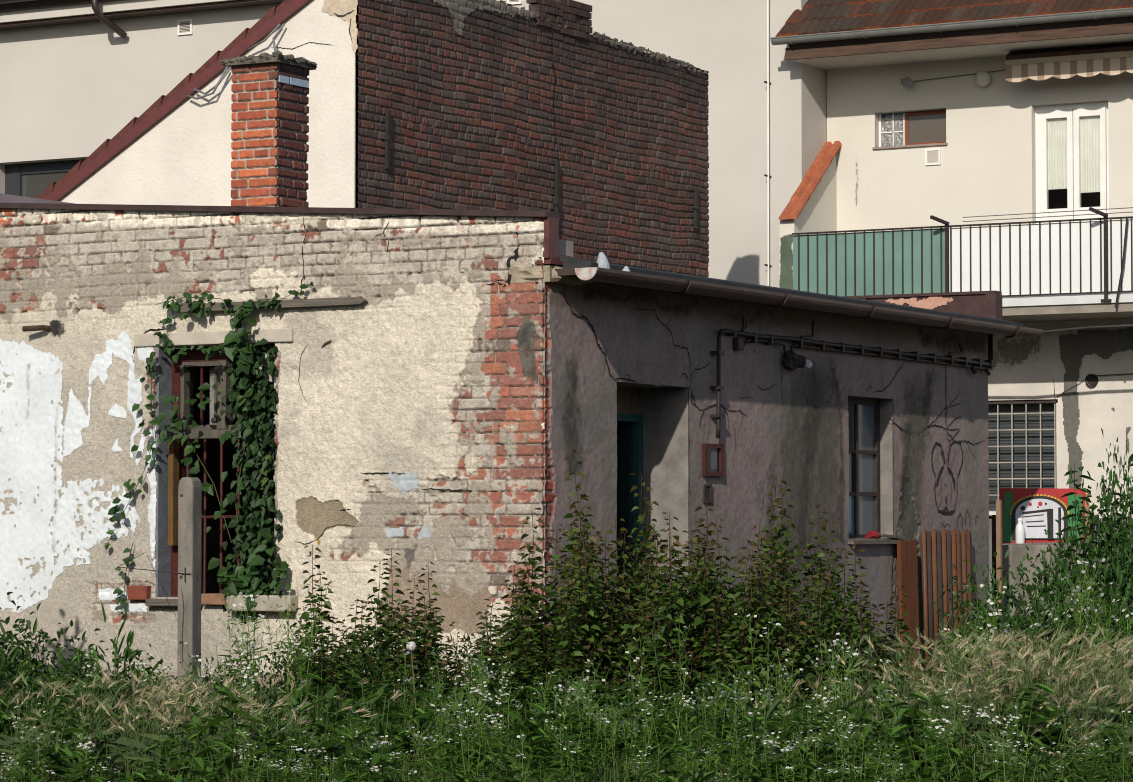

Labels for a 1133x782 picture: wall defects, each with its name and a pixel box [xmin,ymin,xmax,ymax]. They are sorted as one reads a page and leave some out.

peeling [886,296,953,309]
flaking render [0,208,557,635]
crack [634,308,783,442]
crack [867,362,987,461]
leakage [757,367,844,612]